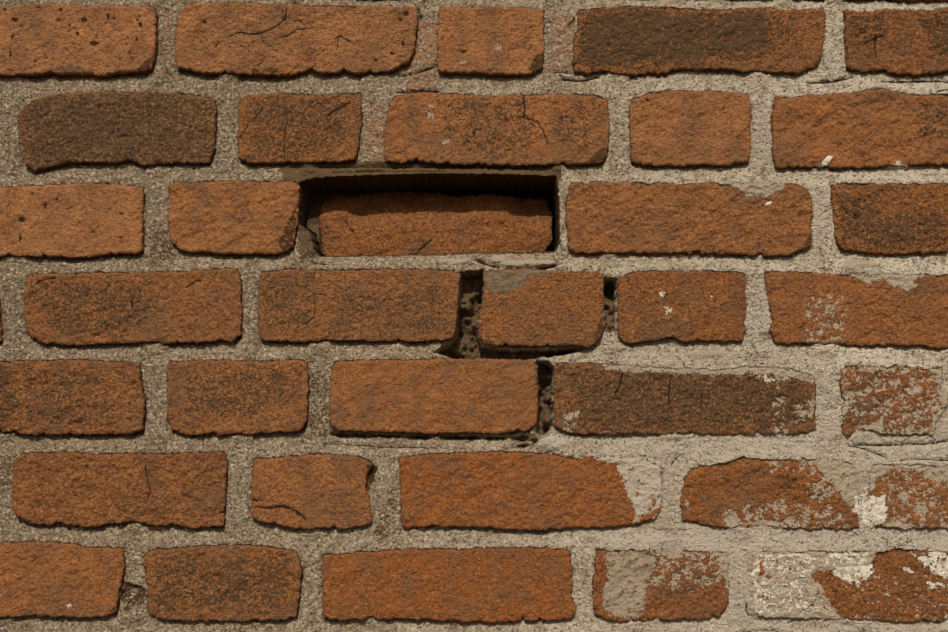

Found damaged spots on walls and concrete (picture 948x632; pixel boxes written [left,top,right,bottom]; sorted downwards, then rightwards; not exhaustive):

damp [778,464,833,502]